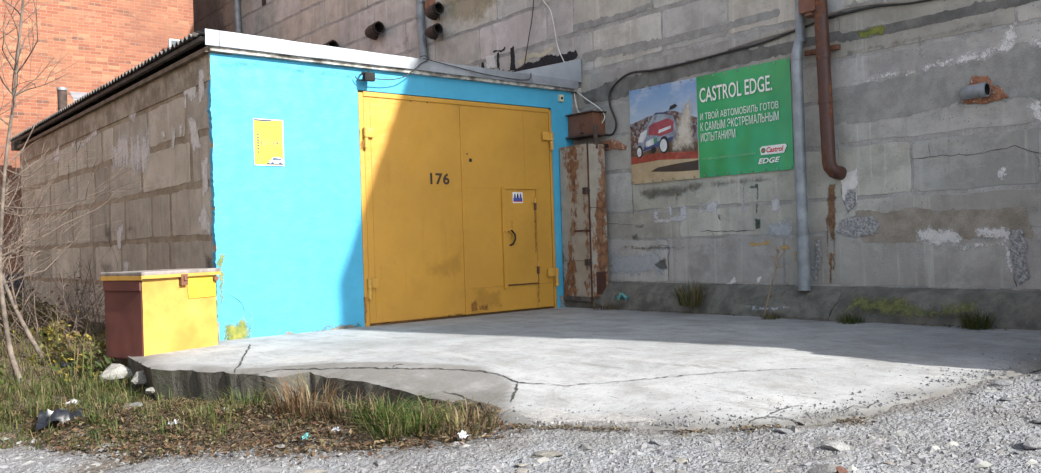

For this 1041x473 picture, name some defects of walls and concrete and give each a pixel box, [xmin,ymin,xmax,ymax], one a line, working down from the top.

crack [915,145,1041,160]
rust [826,185,836,283]
spalling [837,189,881,238]